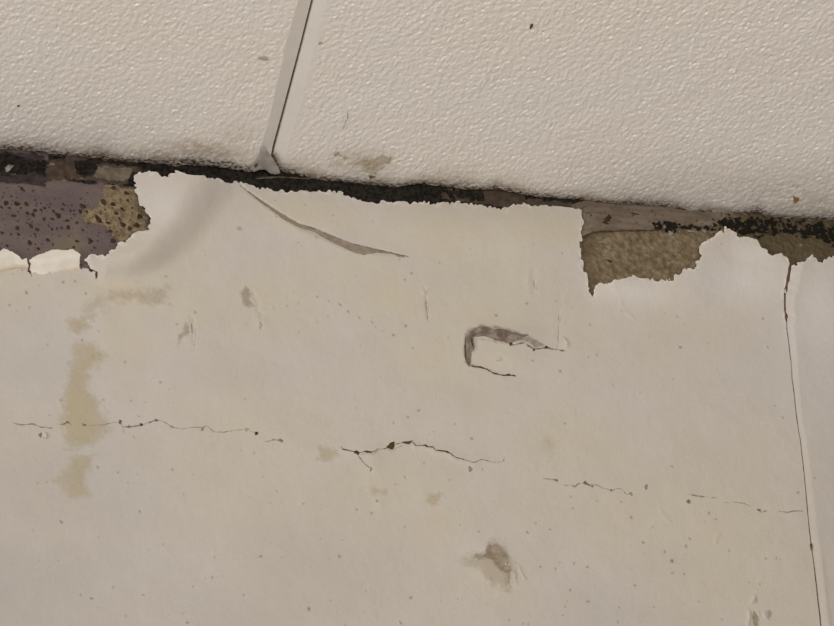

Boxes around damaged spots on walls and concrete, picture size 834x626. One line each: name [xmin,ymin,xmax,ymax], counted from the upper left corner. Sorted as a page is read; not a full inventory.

peeling [0,149,249,296]
peeling [571,200,834,296]
crack [14,419,283,442]
crack [342,441,504,472]